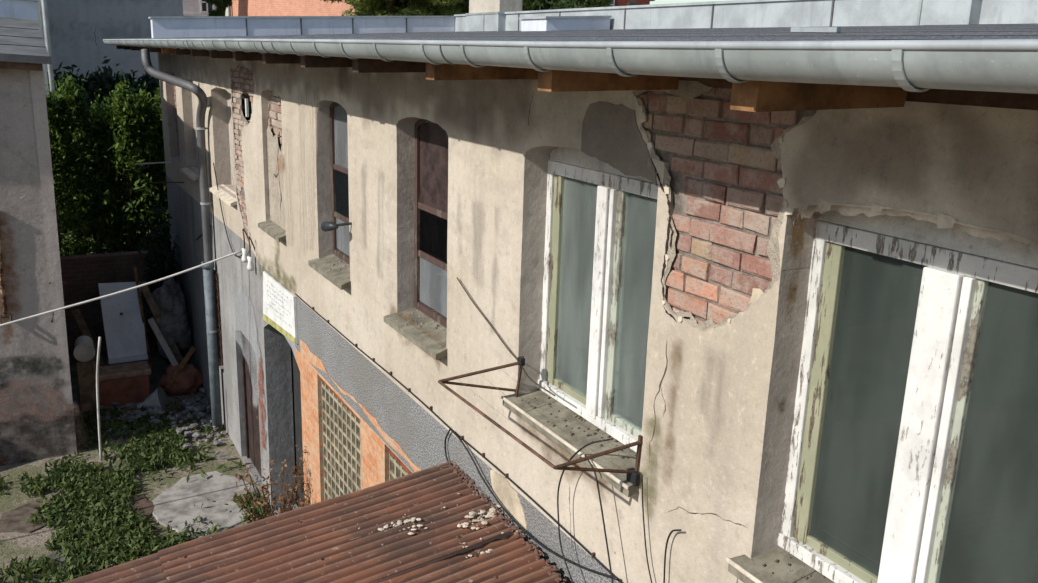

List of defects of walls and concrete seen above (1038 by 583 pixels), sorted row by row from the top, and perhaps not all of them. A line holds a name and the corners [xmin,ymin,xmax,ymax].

corrosion [0,220,18,343]
water stain [0,357,63,388]
spalling [230,61,256,242]
crack [649,158,677,463]
spalling [633,80,1038,331]
crack [668,507,749,529]